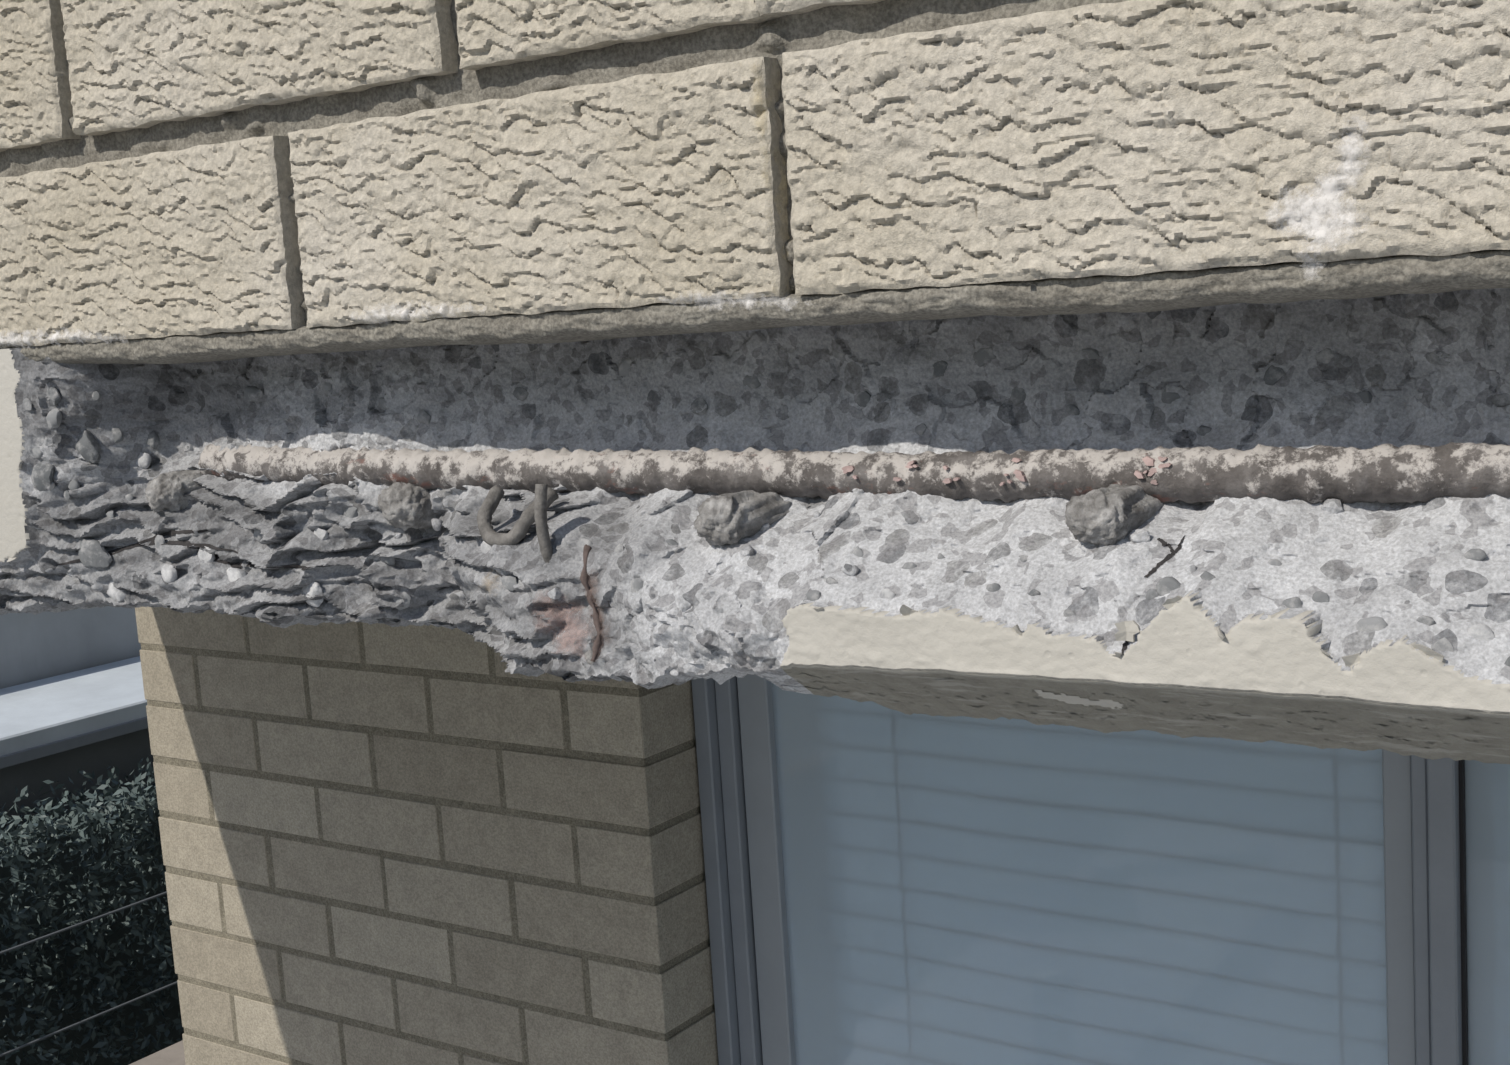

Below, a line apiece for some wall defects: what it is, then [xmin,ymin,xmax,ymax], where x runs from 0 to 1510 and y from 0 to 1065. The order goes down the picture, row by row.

spalling [0,288,1510,695]
rust [1134,456,1172,485]
rust [543,579,603,654]
spalling [1035,690,1124,709]